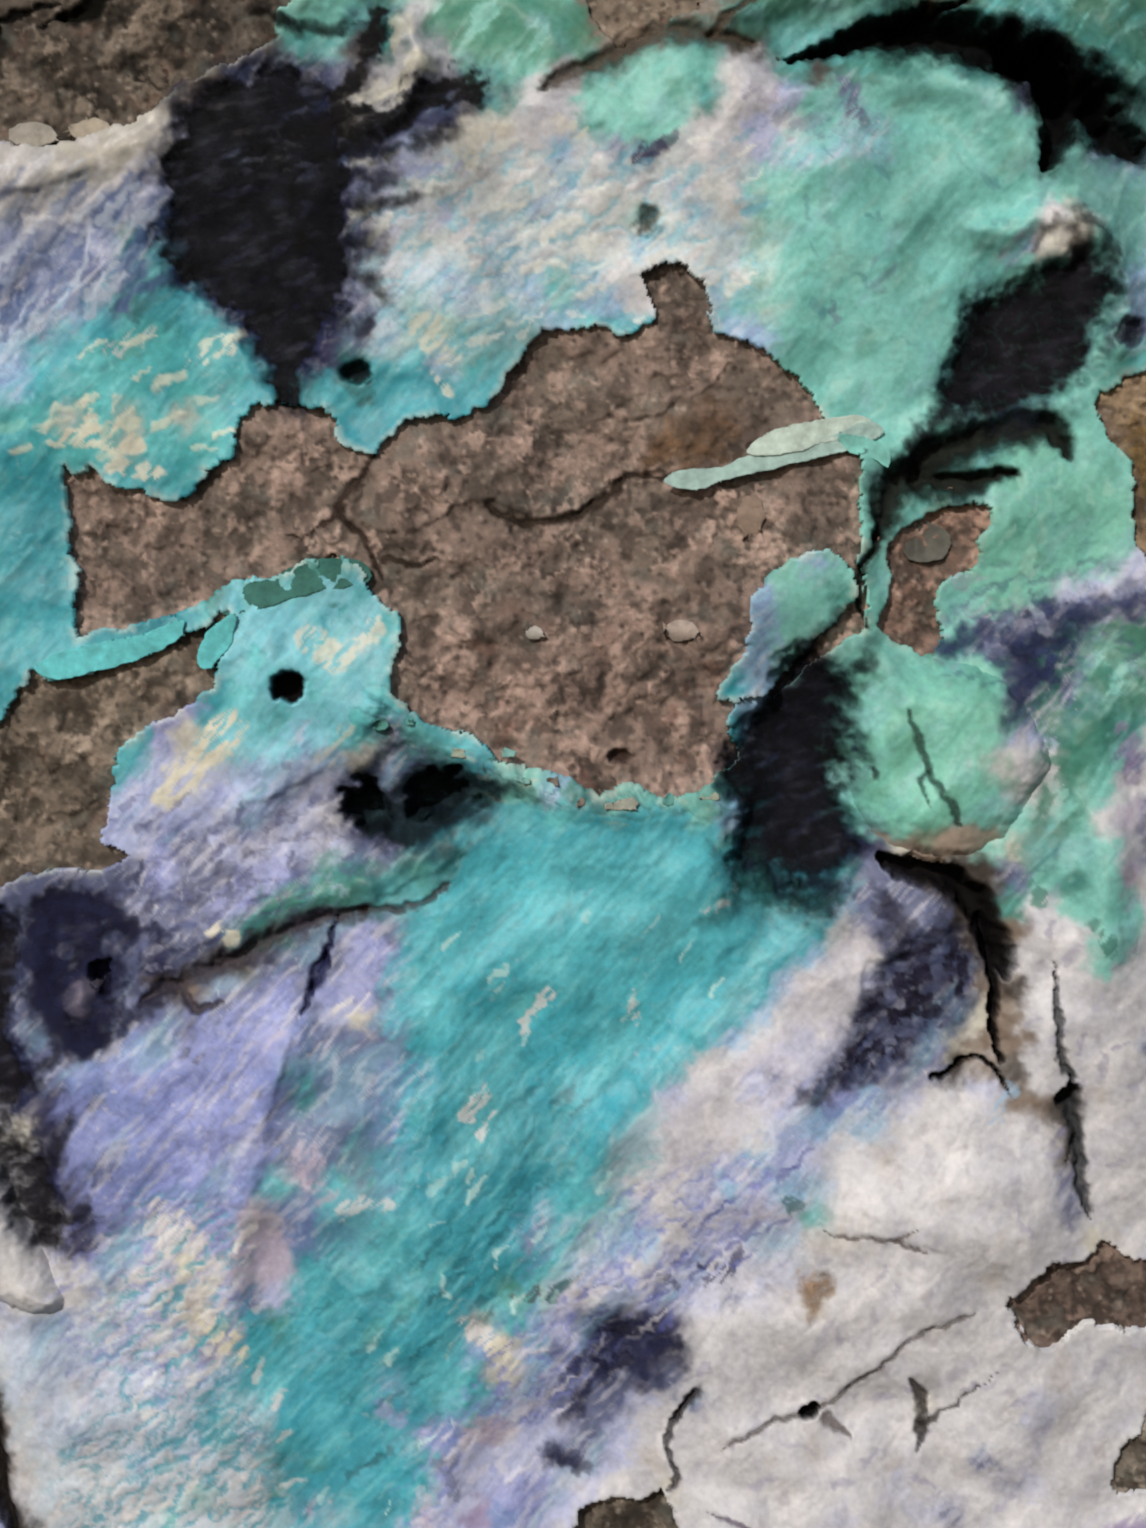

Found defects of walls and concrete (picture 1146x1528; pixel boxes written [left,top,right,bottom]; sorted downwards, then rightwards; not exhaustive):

spalling [0,0,290,147]
water stain [153,0,490,407]
water stain [903,214,1123,463]
peeling [0,262,991,887]
peeling [1094,371,1146,557]
water stain [716,620,876,916]
crack [139,882,449,1014]
crack [875,849,1014,1090]
crack [1052,961,1091,1217]
crack [723,1313,998,1451]
peeling [1006,1240,1146,1348]
peeling [575,1488,679,1528]